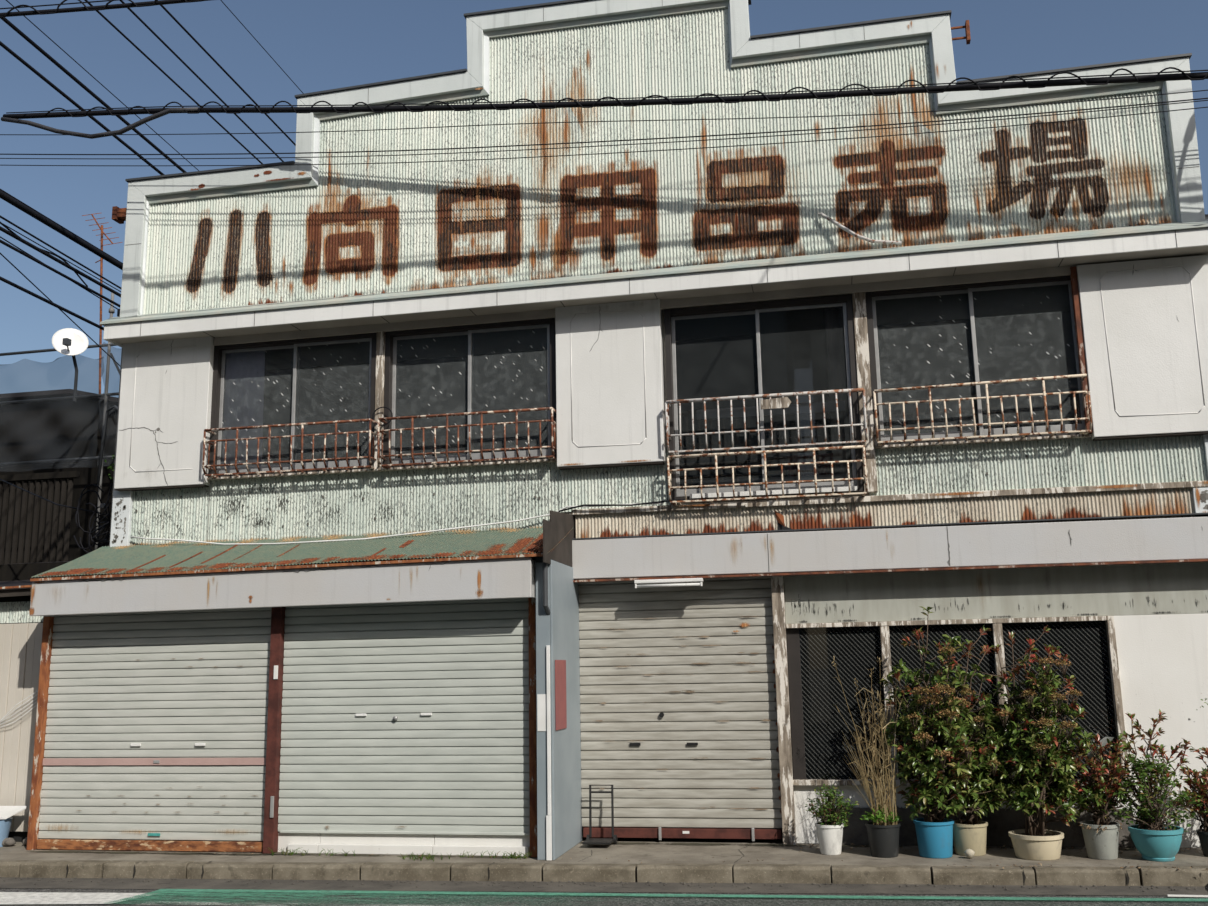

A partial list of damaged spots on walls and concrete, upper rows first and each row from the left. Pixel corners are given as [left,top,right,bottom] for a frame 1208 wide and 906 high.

corrosion [412,53,677,291]
corrosion [692,126,805,265]
corrosion [832,70,952,253]
corrosion [967,108,1171,241]
corrosion [29,521,775,615]
corrosion [790,506,872,532]
corrosion [1021,505,1101,523]
corrosion [1097,481,1208,519]